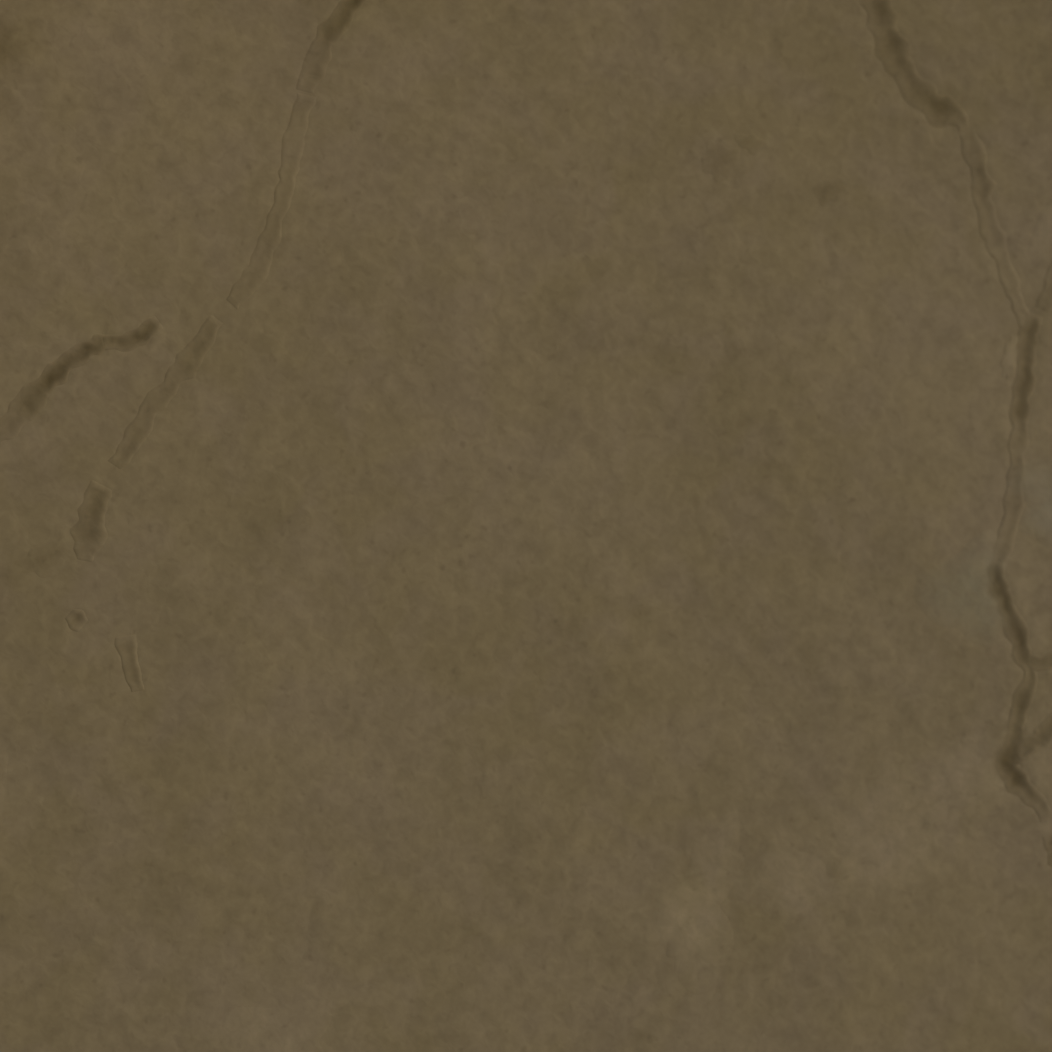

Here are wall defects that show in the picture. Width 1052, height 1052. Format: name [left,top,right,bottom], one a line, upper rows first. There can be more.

crack [0,316,163,446]
crack [859,0,1052,867]